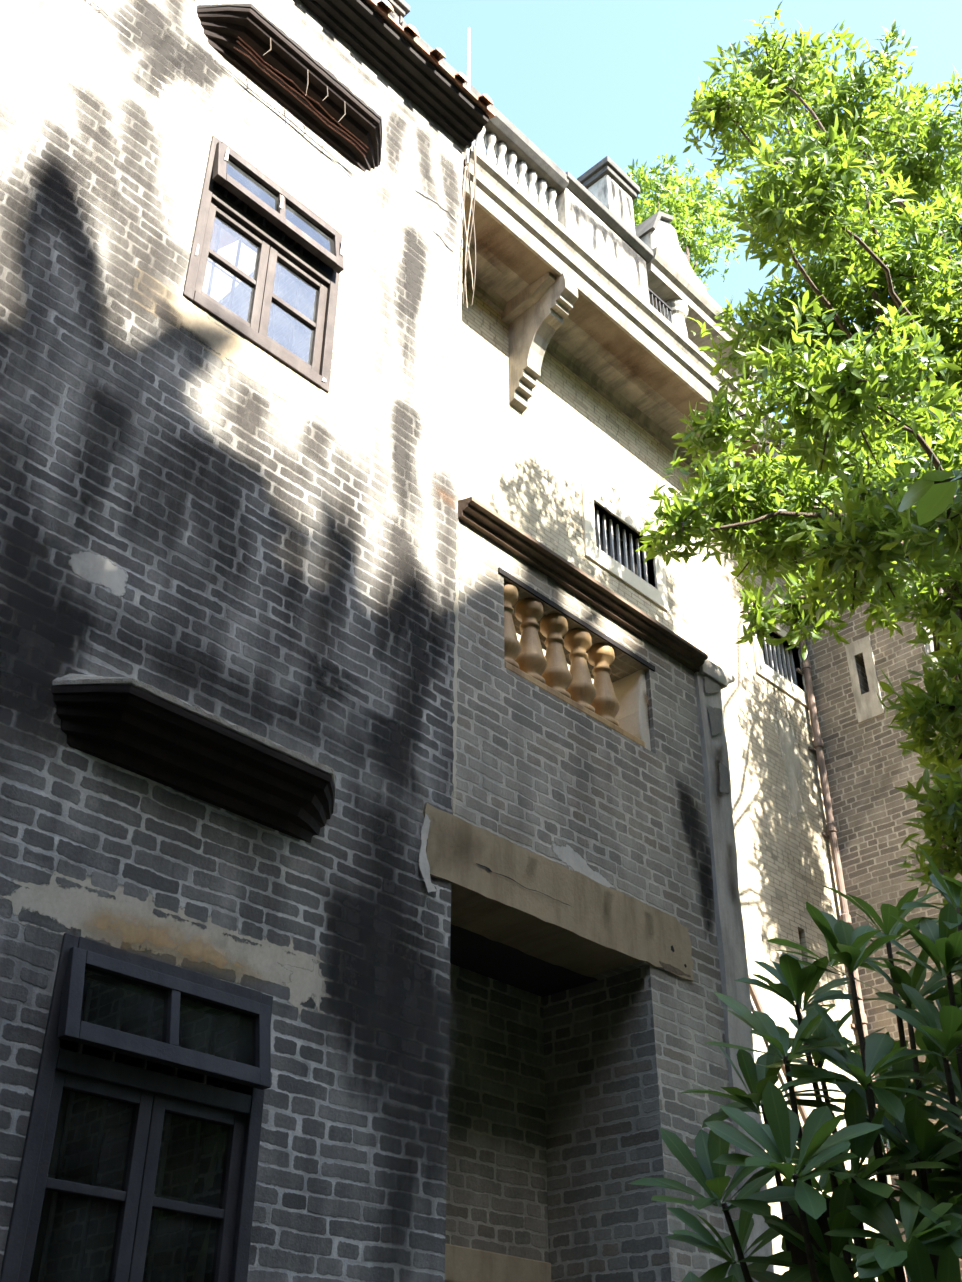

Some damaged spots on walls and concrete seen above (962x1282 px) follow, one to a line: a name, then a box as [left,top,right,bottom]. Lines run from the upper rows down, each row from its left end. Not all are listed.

spalling [419,813,437,893]
crack [476,863,570,906]